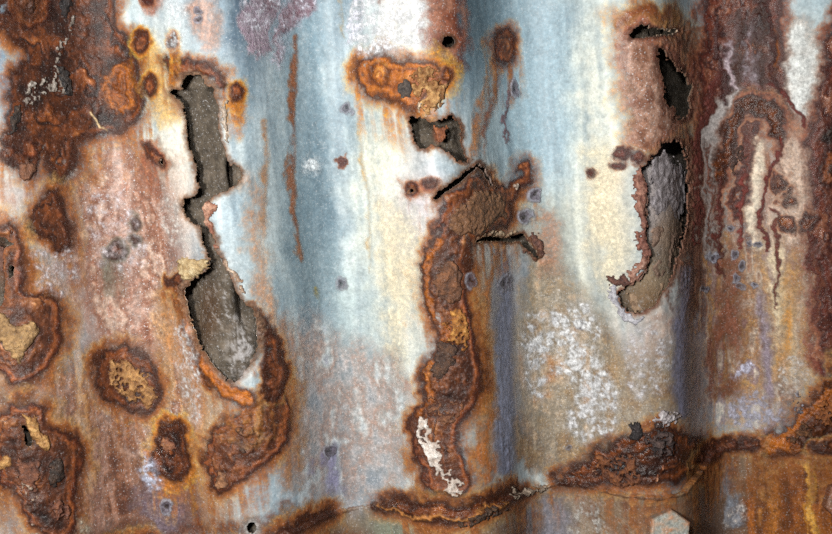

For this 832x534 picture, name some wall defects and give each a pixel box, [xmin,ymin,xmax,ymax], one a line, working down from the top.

peeling [221,100,229,143]
peeling [433,125,449,142]
peeling [606,40,740,313]
peeling [202,200,219,249]
peeling [176,257,209,280]
rust [0,0,541,534]
rust [512,0,832,534]